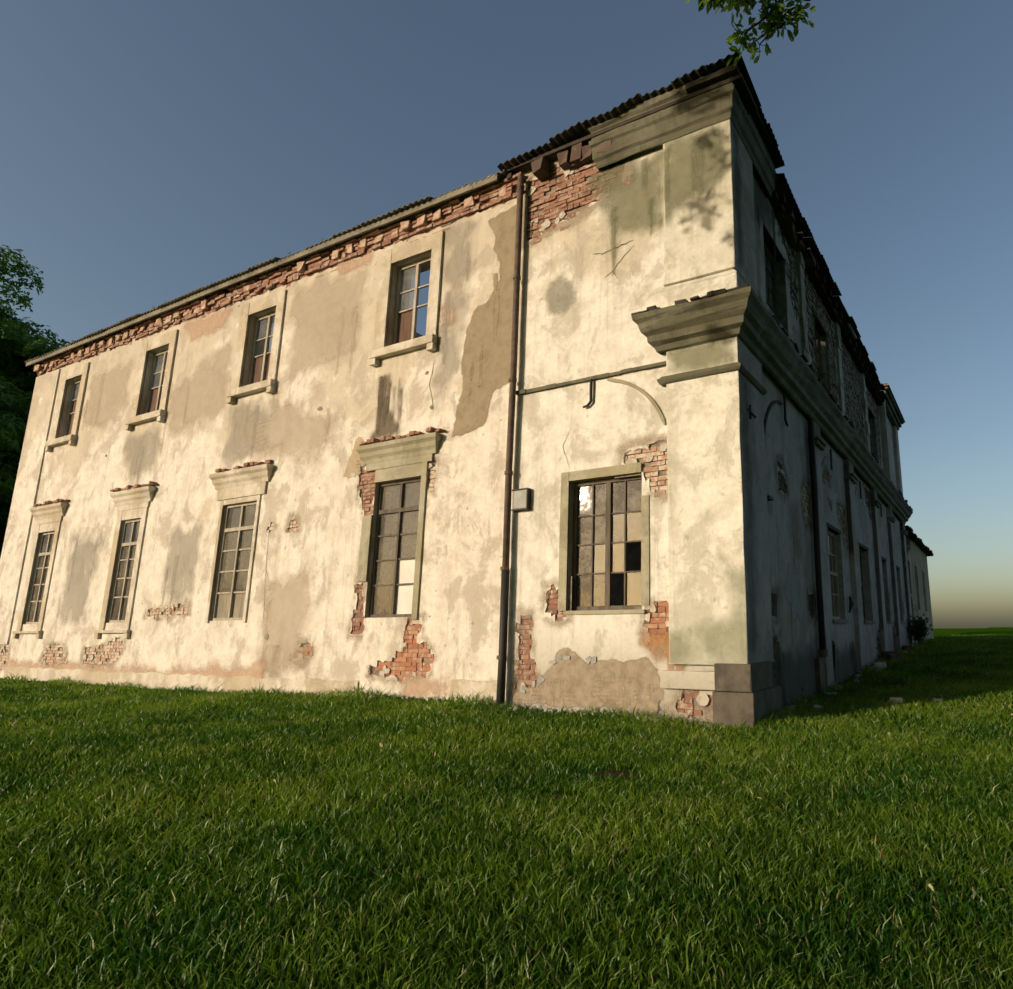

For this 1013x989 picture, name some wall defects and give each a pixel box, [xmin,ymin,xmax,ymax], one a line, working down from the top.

flaking render [63,132,634,362]
leakage [549,279,570,312]
flaking render [774,209,839,405]
flaking render [614,437,668,501]
flaking render [349,573,372,637]
flaking render [543,576,572,625]
flaking render [0,644,10,671]
flaking render [39,642,67,667]
flaking render [80,638,125,669]
flaking render [367,616,435,683]
peeling [512,601,713,723]